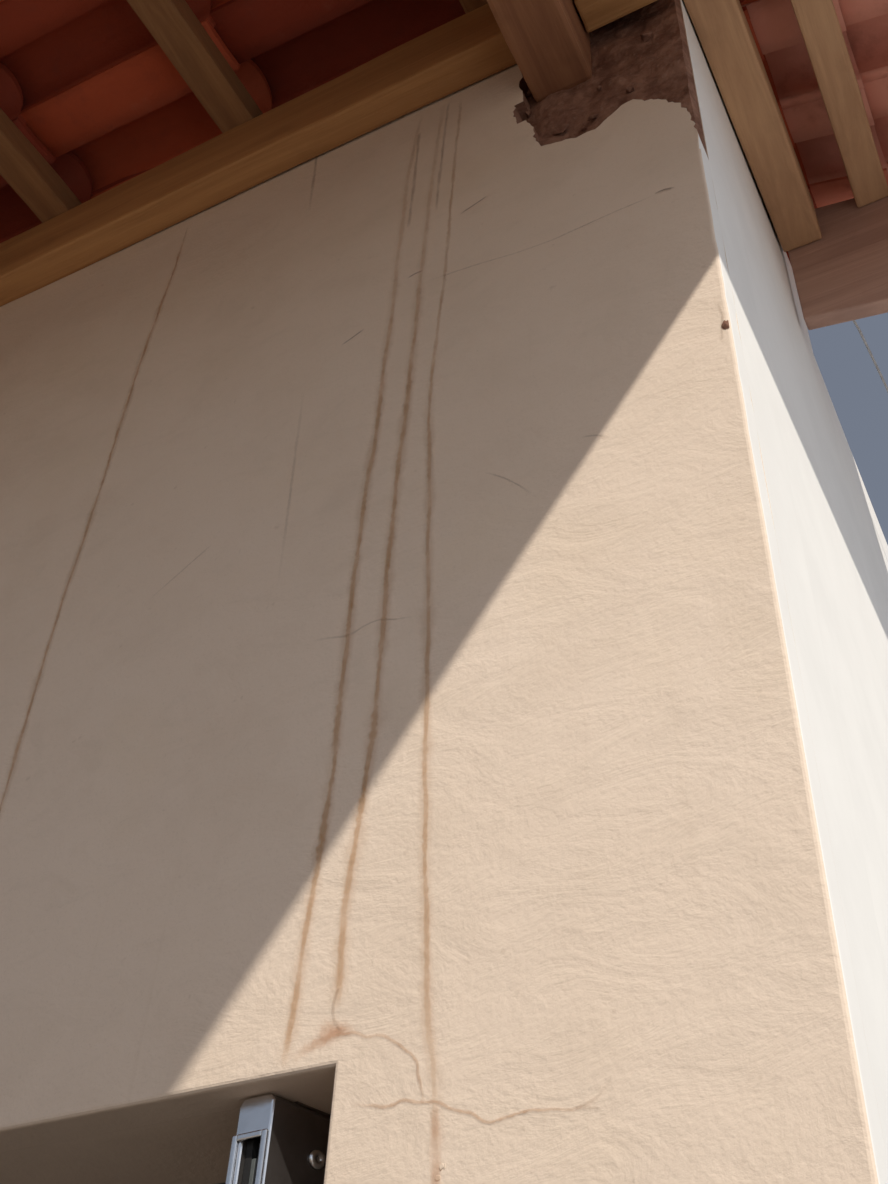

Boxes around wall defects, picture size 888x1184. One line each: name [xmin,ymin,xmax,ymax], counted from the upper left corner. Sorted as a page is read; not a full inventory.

flaking render [522,0,707,154]